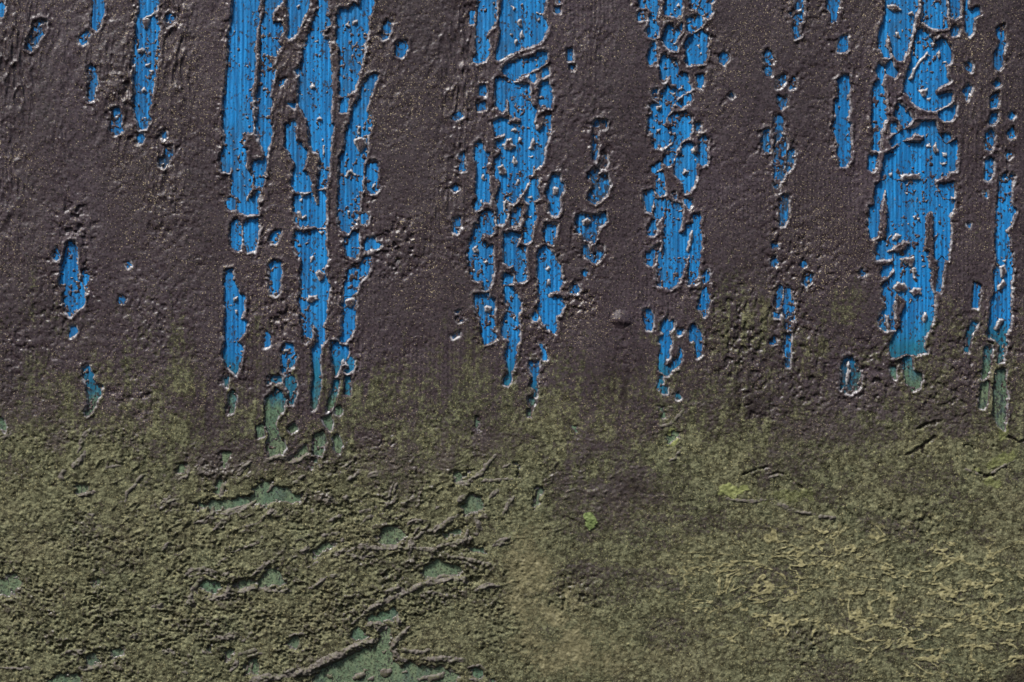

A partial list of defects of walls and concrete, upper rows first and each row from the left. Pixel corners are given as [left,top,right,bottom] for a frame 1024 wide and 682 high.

peeling [53,241,89,338]
peeling [79,0,105,45]
peeling [133,0,175,144]
peeling [220,0,382,469]
peeling [459,0,610,386]
peeling [638,0,729,400]
peeling [761,50,795,227]
peeling [832,75,852,167]
peeling [867,0,980,392]
peeling [964,25,1016,431]
water stain [504,517,637,679]
water stain [665,513,1024,682]